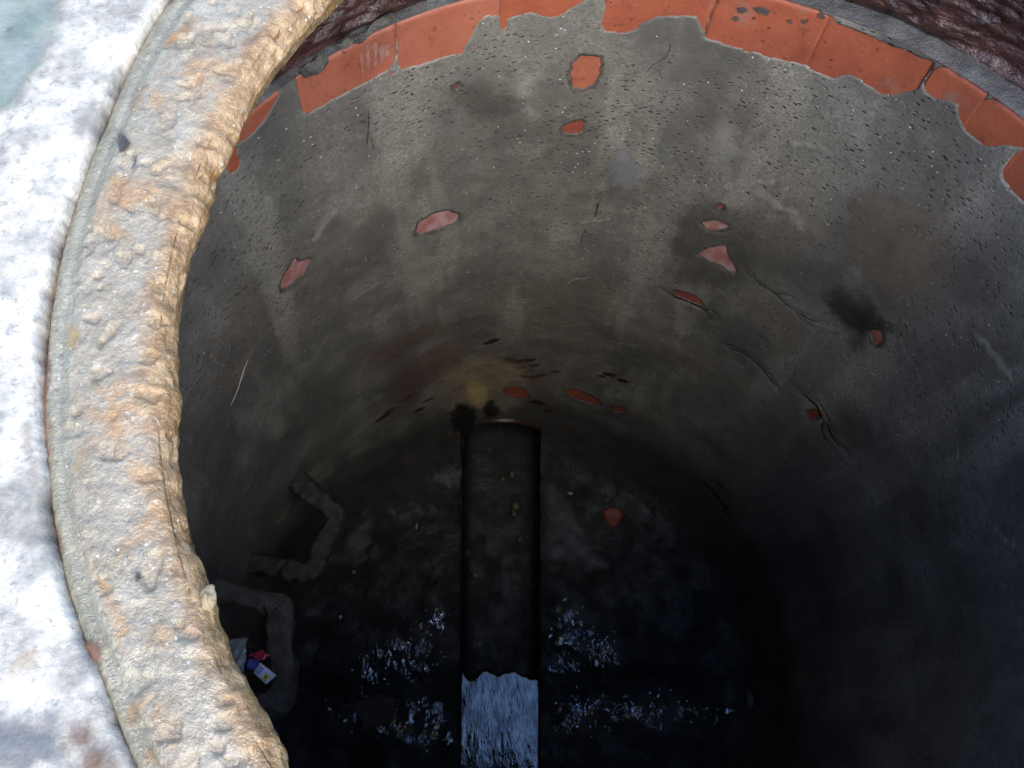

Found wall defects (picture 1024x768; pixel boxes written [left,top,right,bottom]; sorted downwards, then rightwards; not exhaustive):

peeling [300,13,397,78]
spalling [567,54,604,92]
spalling [559,119,587,137]
spalling [413,209,462,236]
spalling [697,203,743,275]
spalling [278,257,314,293]
water stain [828,298,887,337]
crack [803,394,841,447]